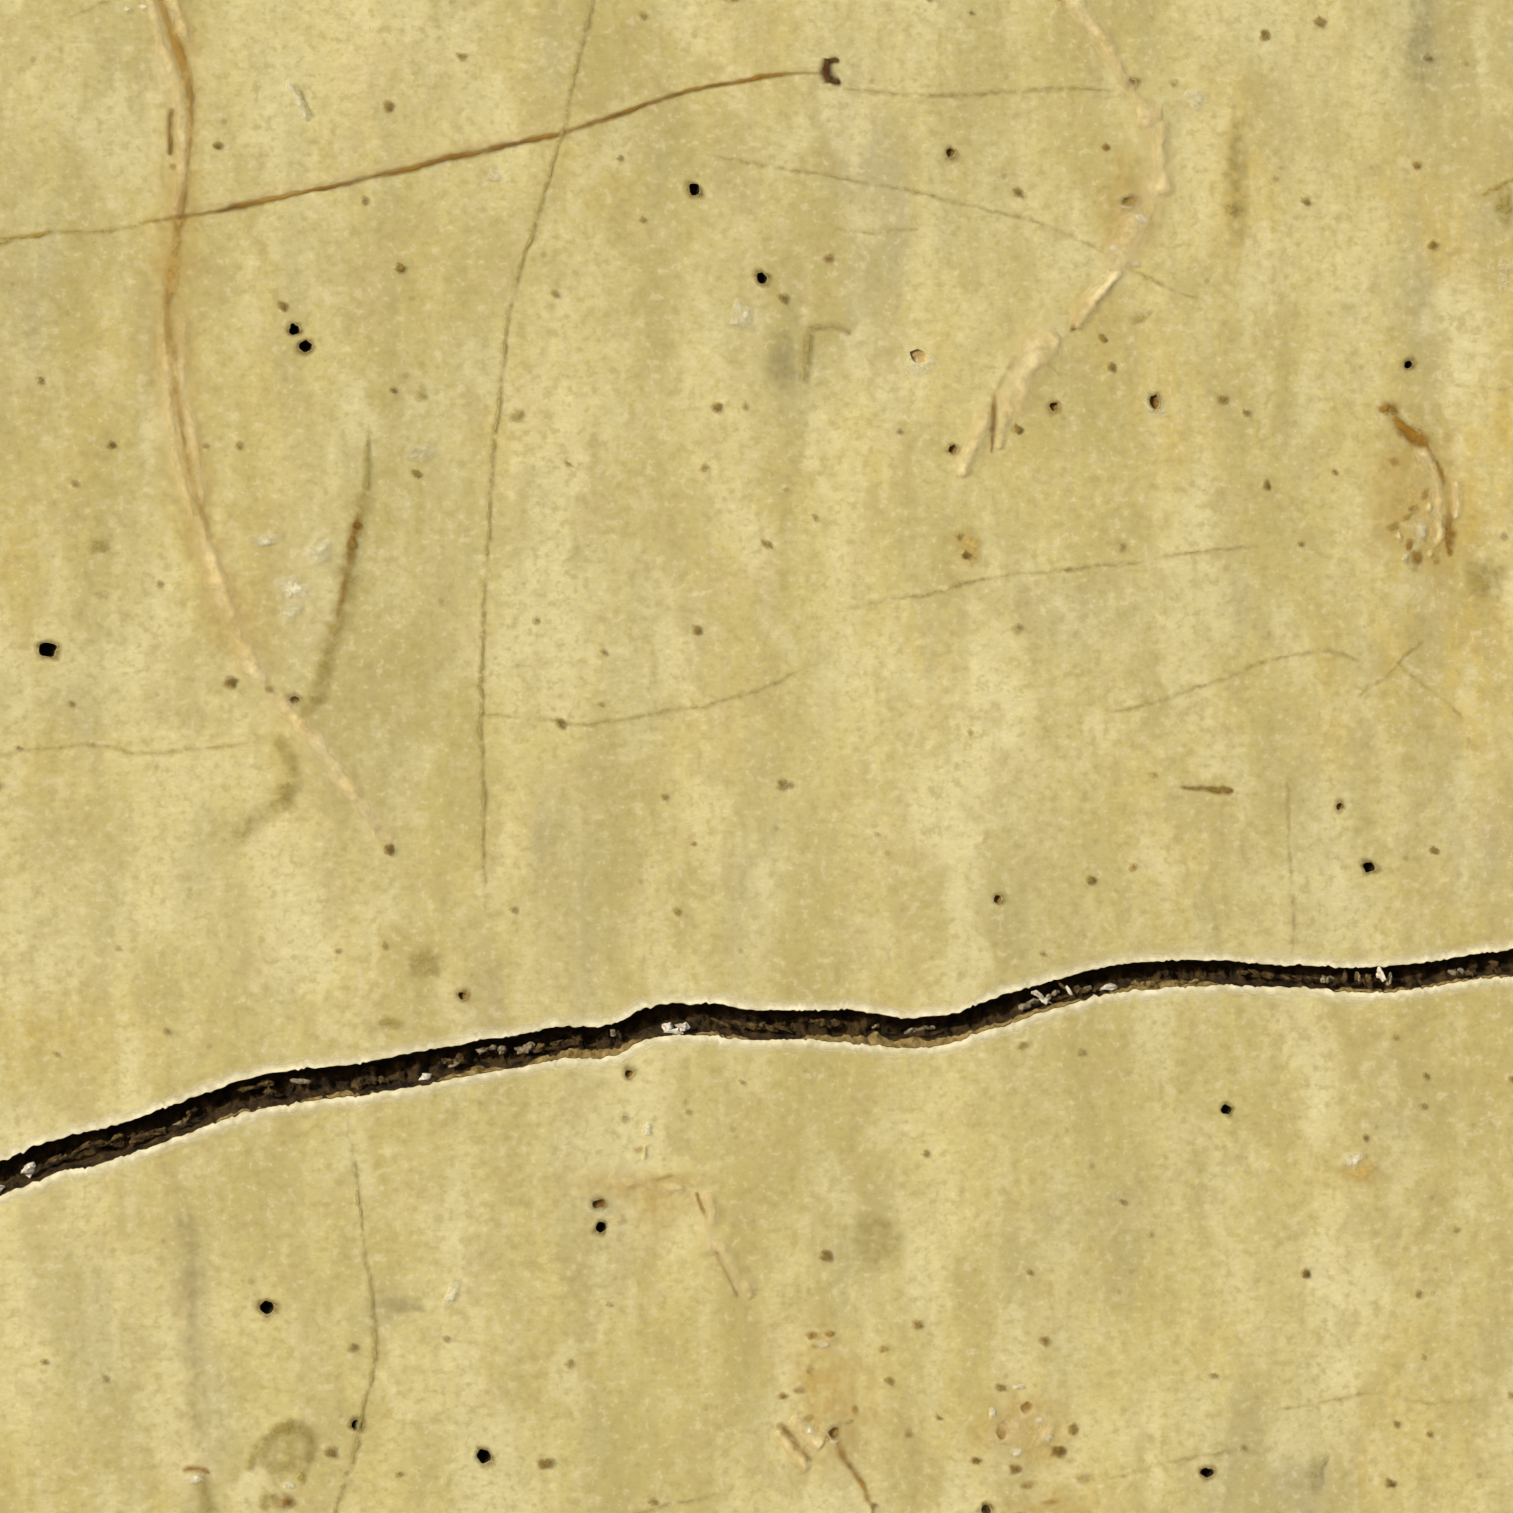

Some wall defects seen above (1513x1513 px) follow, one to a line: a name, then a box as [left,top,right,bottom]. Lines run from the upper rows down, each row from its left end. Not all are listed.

crack [0,231,50,244]
crack [125,0,787,868]
crack [0,941,1513,1202]
crack [355,1190,363,1227]
crack [334,1278,377,1513]